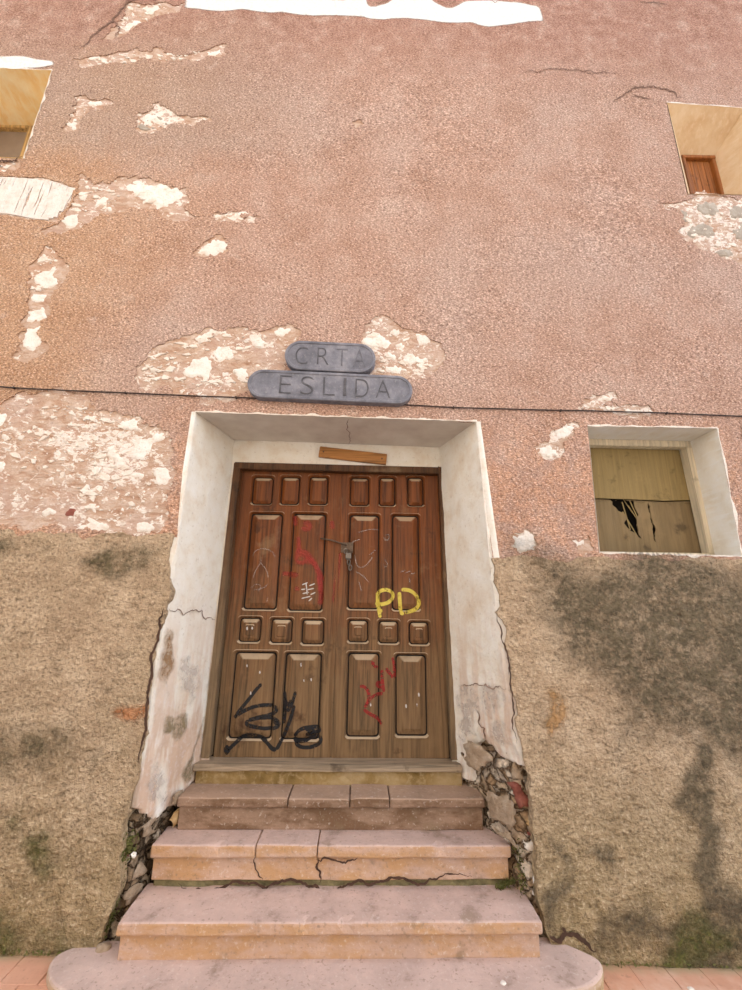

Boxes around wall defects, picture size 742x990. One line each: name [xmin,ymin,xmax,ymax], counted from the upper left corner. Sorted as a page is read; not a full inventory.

crack [75,0,158,47]
peeling [104,0,543,40]
flaking render [0,161,196,364]
flaking render [662,190,742,266]
flaking render [135,324,301,406]
flaking render [361,315,446,380]
flaking render [0,387,177,536]
leakage [86,549,148,577]
crack [138,608,213,762]
leakage [539,552,742,969]
spalling [461,690,546,937]
crack [179,856,472,889]